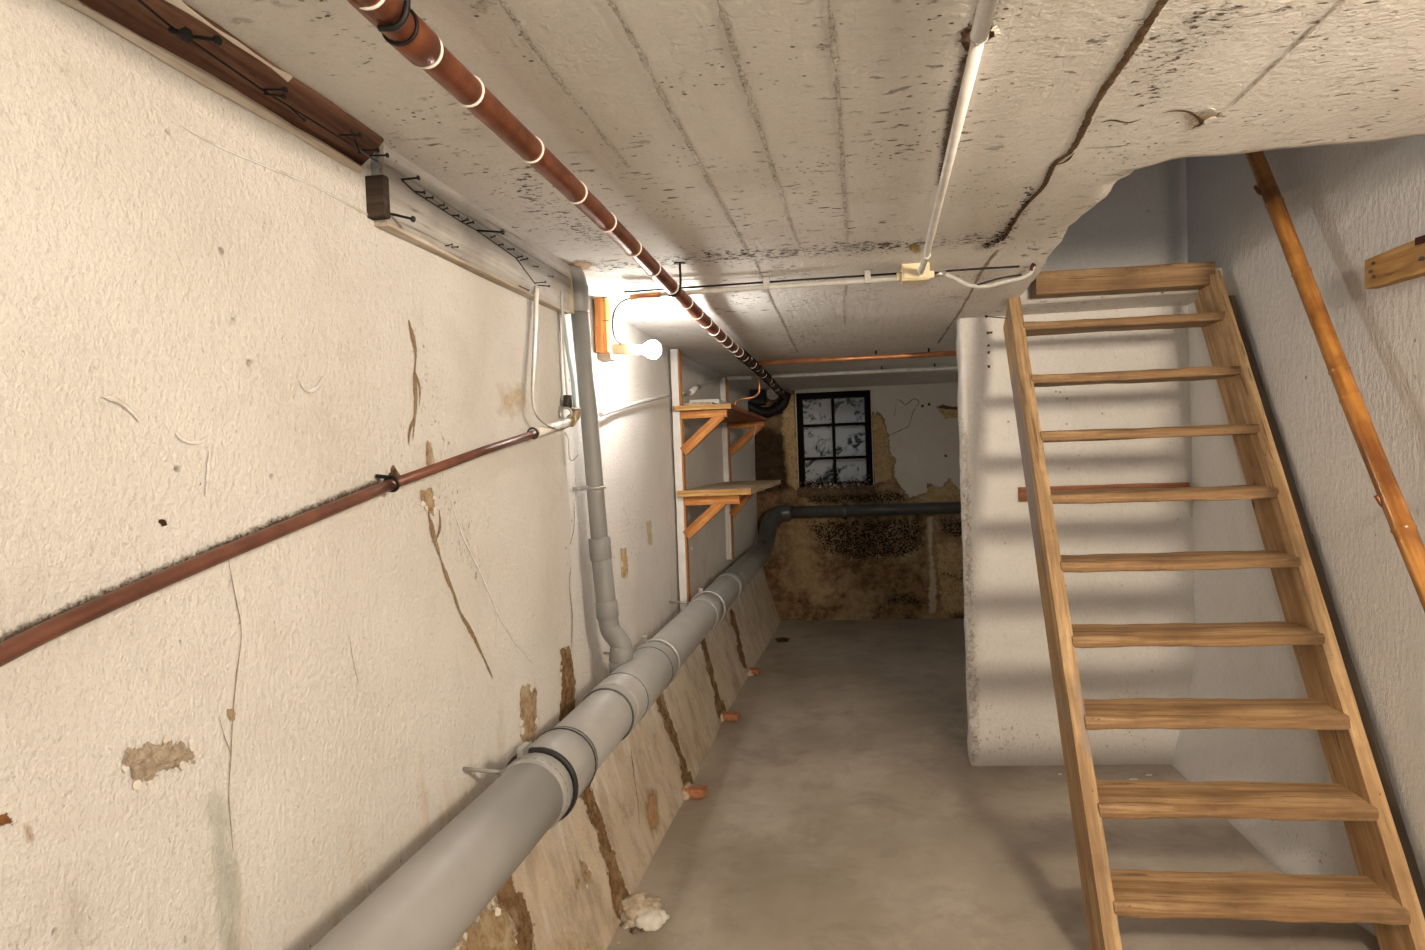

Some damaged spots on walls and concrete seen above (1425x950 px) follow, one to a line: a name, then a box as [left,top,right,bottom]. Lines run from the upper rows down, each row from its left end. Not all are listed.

crack [937,0,1345,344]
crack [408,320,421,442]
crack [428,499,533,678]
peeling [756,390,981,763]
water stain [804,487,962,614]
spalling [121,733,200,791]
crack [219,560,242,852]
spalling [519,683,539,743]
spalling [454,891,532,950]
peeling [575,858,593,891]
spalling [610,877,629,920]